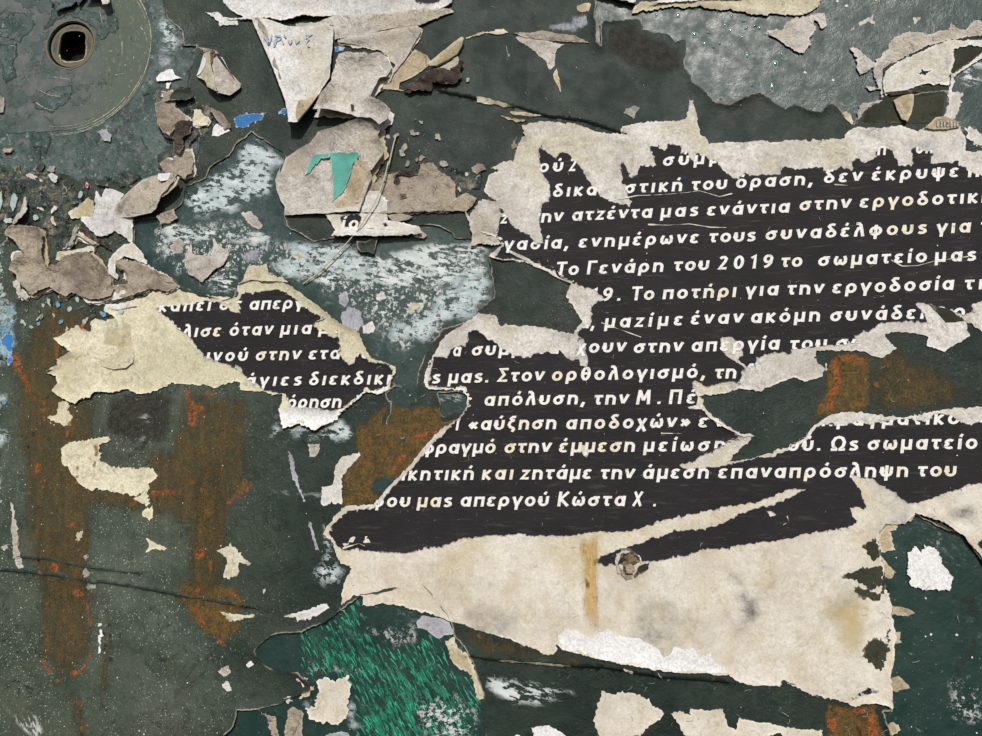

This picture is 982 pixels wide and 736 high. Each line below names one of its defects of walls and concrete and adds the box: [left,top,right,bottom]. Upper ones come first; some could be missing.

peeling [158,97,214,162]
peeling [551,0,982,124]
peeling [948,56,982,146]
peeling [0,162,141,358]
peeling [135,133,494,428]
rust [815,351,953,417]
rust [12,303,250,682]
rust [343,405,457,506]
crack [0,555,235,606]
peeling [558,629,728,674]
peeling [878,515,982,736]
rust [826,704,885,736]